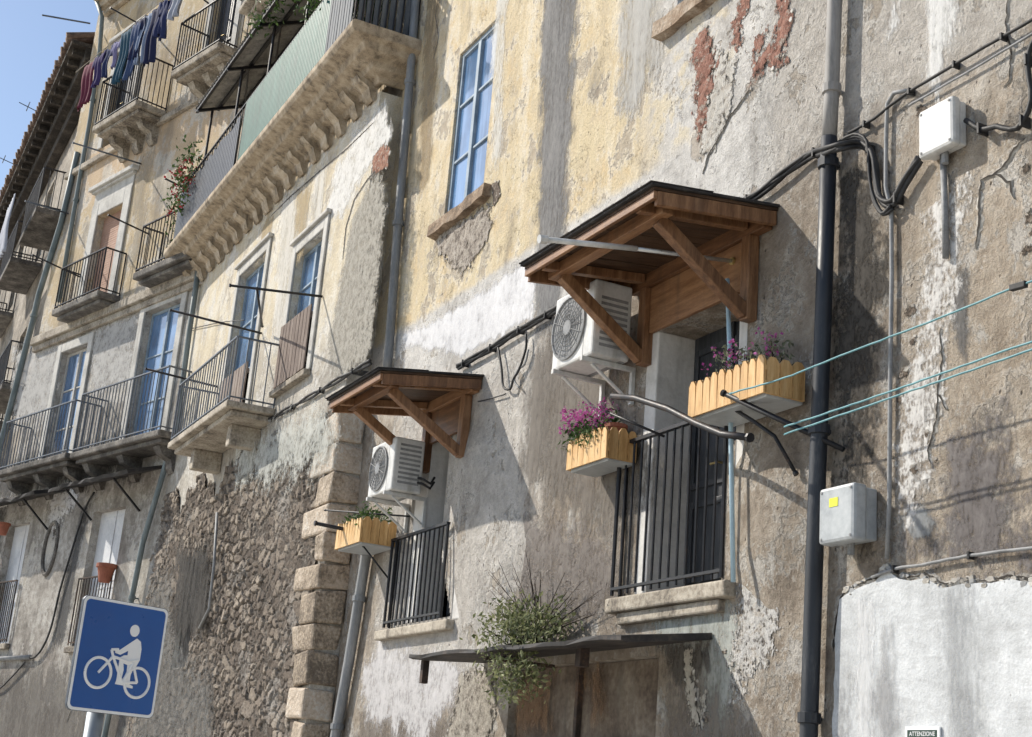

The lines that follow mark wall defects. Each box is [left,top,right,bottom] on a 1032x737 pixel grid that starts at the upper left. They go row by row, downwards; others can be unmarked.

flaking render [371,142,391,174]
flaking render [437,180,501,279]
leakage [536,0,577,251]
flaking render [688,0,797,161]
crack [975,137,1027,248]
leakage [830,159,898,486]
crack [927,328,948,469]
flaking render [684,647,710,730]
flaking render [722,583,786,716]
crack [831,562,1032,652]
flaking render [842,564,1032,595]